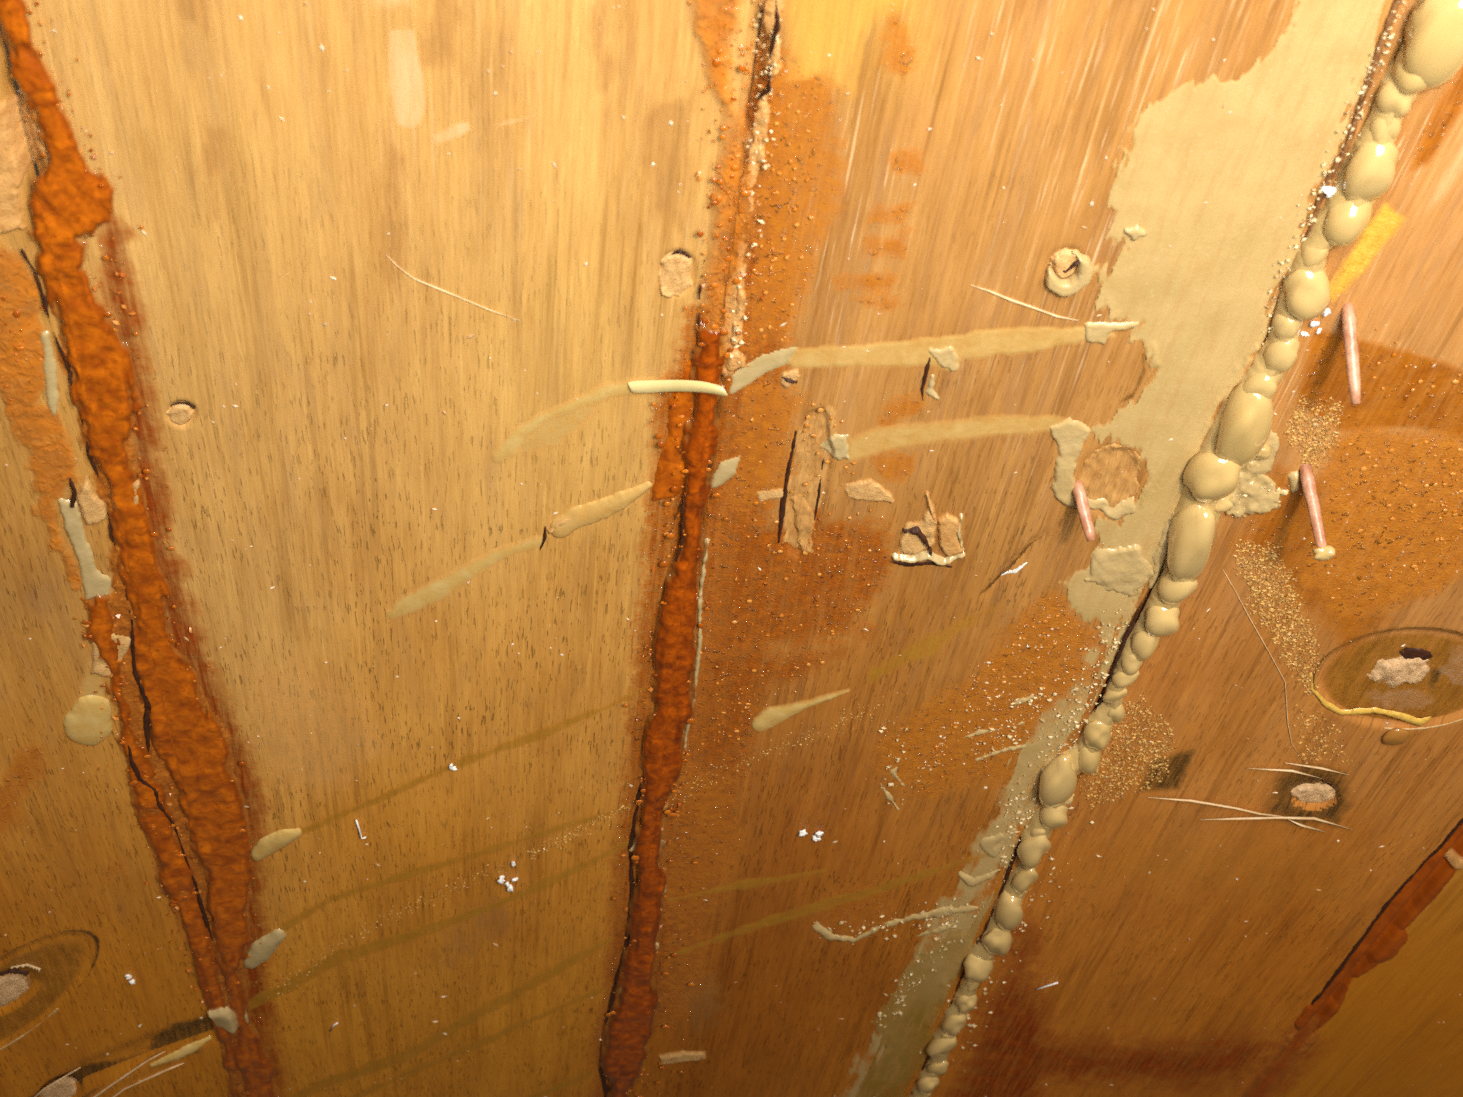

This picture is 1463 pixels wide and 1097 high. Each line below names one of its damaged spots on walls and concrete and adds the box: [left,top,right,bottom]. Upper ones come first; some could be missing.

crack [758,0,780,98]
peeling [0,94,46,234]
crack [20,249,116,548]
crack [676,494,686,562]
rust [652,43,895,1022]
peeling [891,493,965,566]
peeling [1050,417,1141,520]
peeling [1225,429,1300,518]
crack [123,582,213,941]
rust [101,217,283,1088]
rust [593,304,726,1097]
rust [877,598,1091,798]